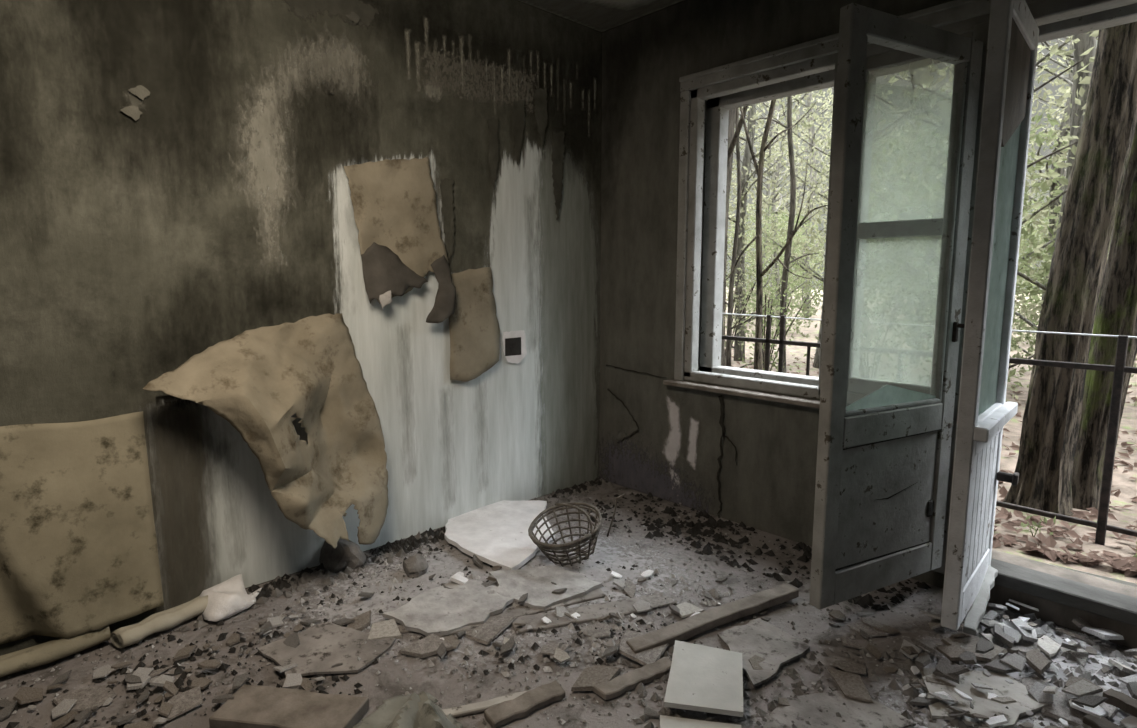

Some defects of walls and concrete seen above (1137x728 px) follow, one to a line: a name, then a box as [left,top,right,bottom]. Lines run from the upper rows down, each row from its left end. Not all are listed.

peeling [551,131,565,220]
peeling [440,178,455,265]
peeling [665,398,699,505]